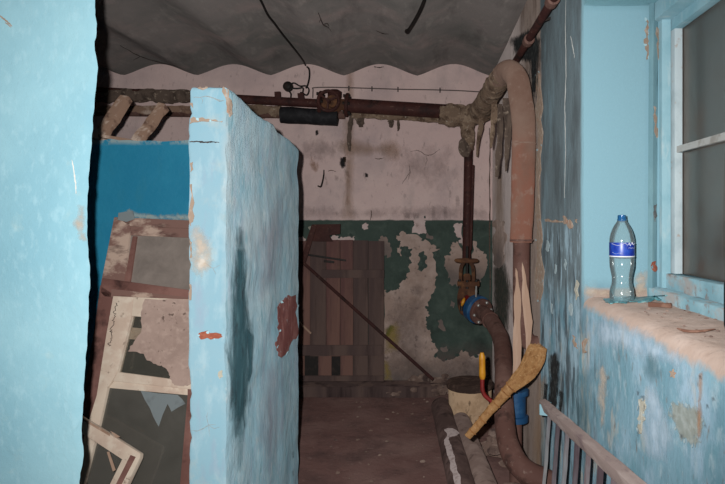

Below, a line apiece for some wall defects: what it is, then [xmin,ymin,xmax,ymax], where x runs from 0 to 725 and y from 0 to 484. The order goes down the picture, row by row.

peeling [643,18,659,60]
flaking render [190,87,233,124]
peeling [534,71,577,302]
peeling [472,219,507,290]
flaking render [198,331,222,340]
leakage [228,231,253,432]
peeling [275,295,299,358]
peeling [379,216,489,384]
leakage [543,353,563,412]
flaking render [636,392,647,434]
peeling [669,401,703,448]